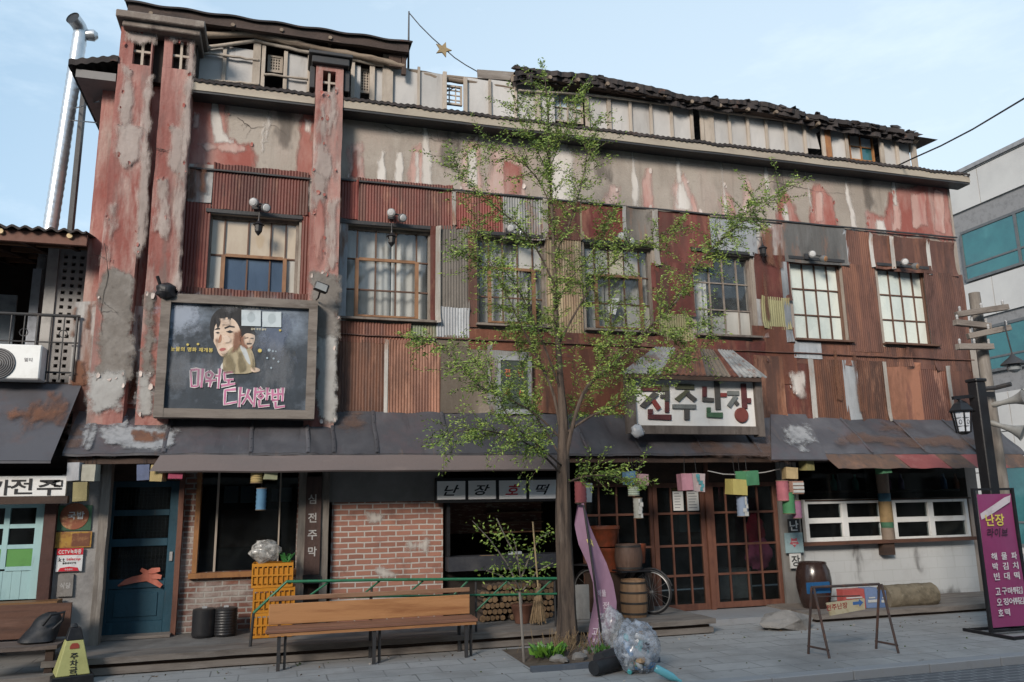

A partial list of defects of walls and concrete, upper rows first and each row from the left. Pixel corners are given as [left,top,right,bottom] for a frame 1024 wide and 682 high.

peeling [116,31,256,254]
peeling [297,88,365,278]
peeling [408,144,423,183]
peeling [460,136,526,195]
peeling [551,144,574,200]
peeling [602,185,619,205]
peeling [672,173,702,213]
peeling [719,177,753,220]
peeling [776,184,838,225]
peeling [865,185,954,242]
rust [761,227,783,320]
rust [853,354,863,412]